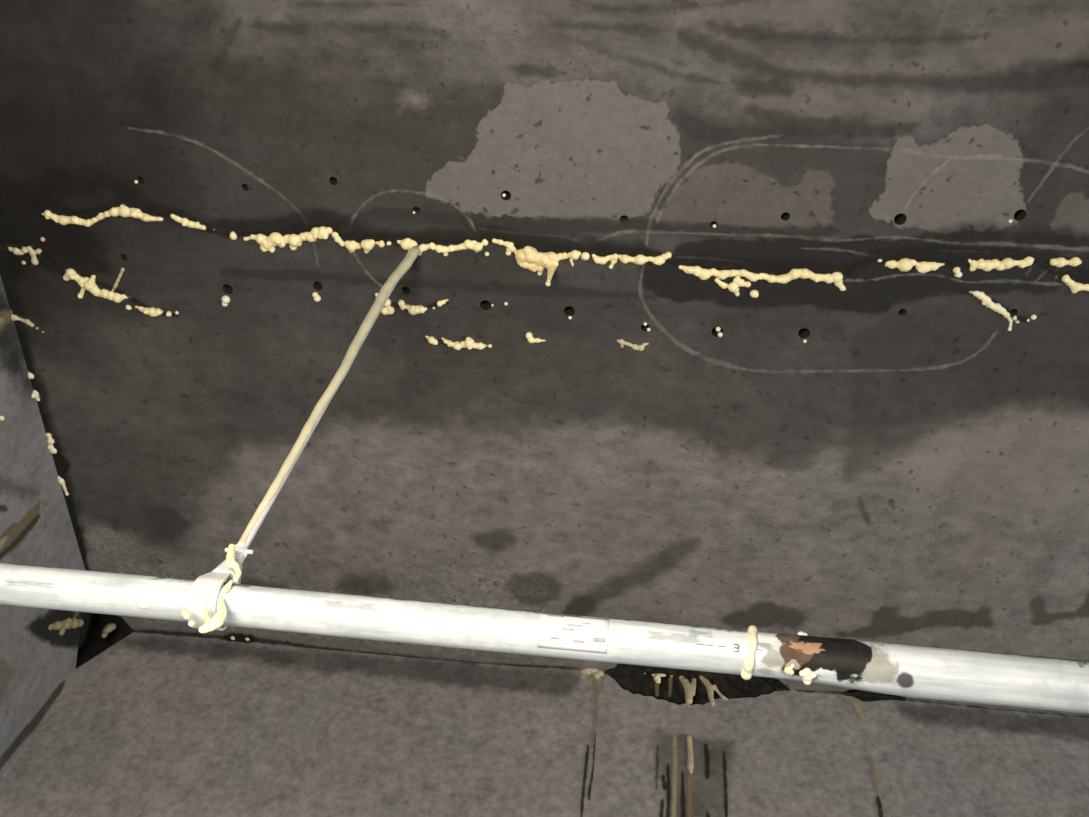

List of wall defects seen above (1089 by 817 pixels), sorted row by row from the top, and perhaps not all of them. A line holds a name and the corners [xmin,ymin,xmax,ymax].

crack [32,200,1089,284]
leakage [384,75,1089,412]
leakage [196,263,444,391]
crack [971,293,1028,322]
crack [0,218,179,571]
leakage [564,584,621,616]
leakage [724,603,804,629]
leakage [837,606,992,638]
leakage [1031,599,1089,625]
spalling [605,663,790,705]
leakage [581,677,603,817]
leakage [656,735,710,817]